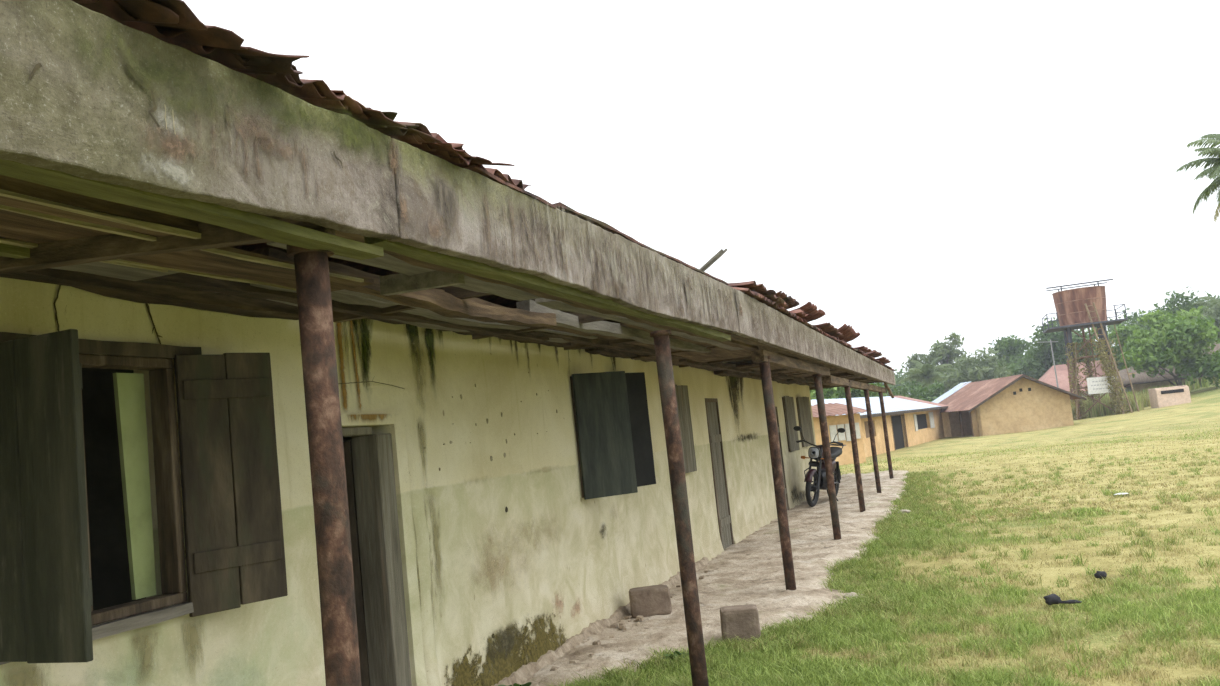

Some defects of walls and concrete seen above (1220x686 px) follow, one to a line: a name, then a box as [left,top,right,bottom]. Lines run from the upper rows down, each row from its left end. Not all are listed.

crack [53,285,61,331]
crack [145,303,163,344]
damp [352,319,370,384]
rust [337,320,386,421]
damp [406,324,443,390]